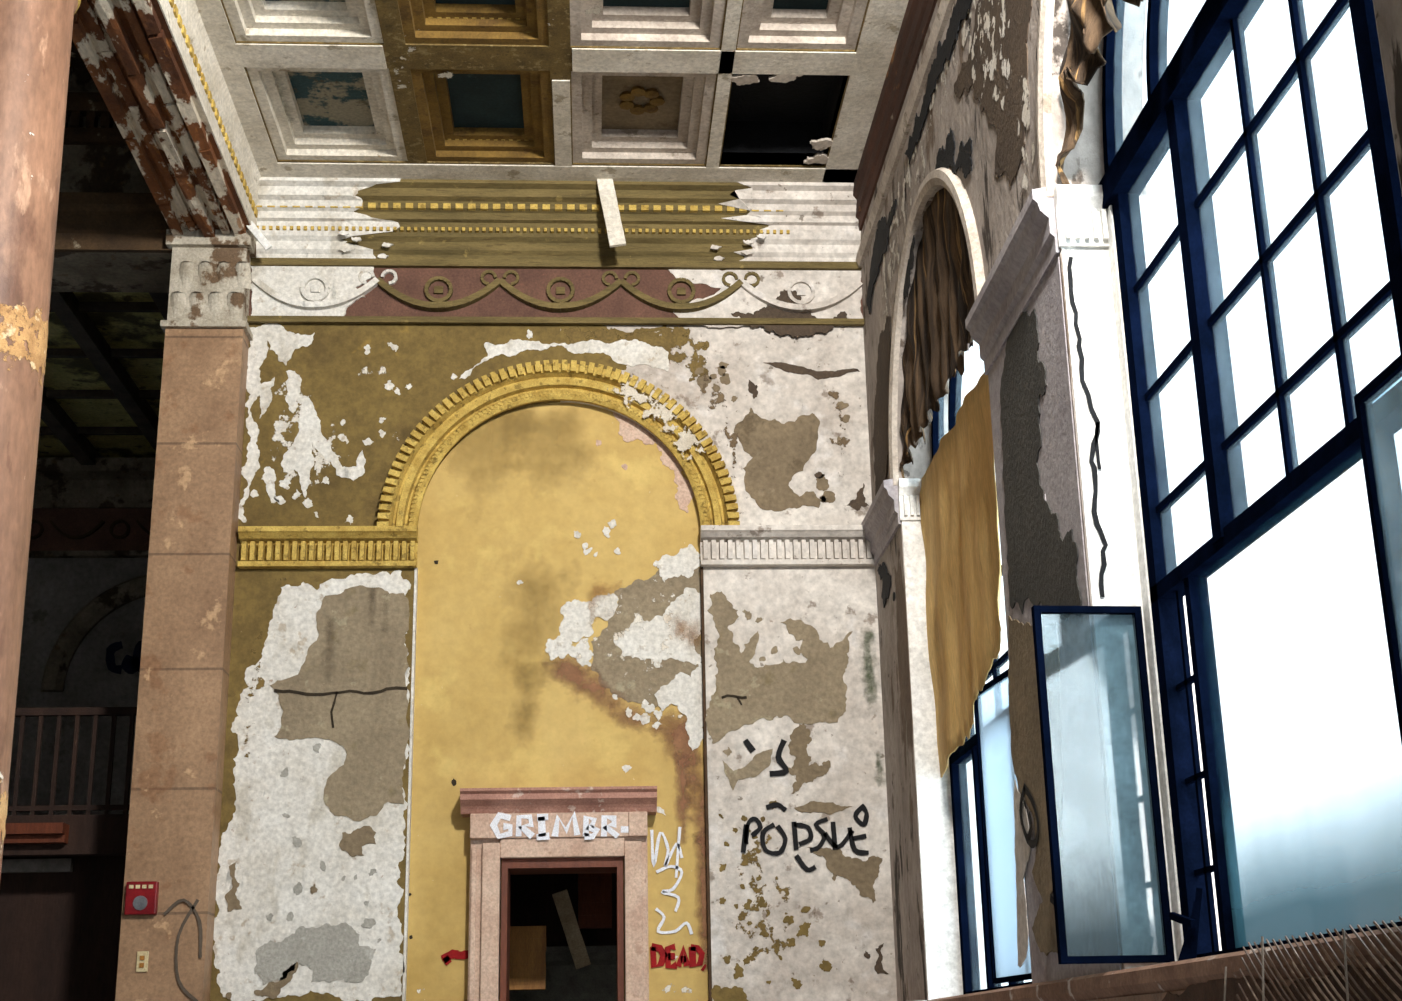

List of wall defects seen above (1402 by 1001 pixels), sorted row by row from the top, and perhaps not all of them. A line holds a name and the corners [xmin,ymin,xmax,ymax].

peeling [195,0,1040,523]
peeling [574,519,621,557]
spalling [877,562,895,608]
spalling [1000,309,1083,967]
crack [274,686,407,728]
peeling [0,772,9,858]
peeling [213,570,421,1001]
spalling [545,544,853,1001]
spalling [808,844,882,903]
spalling [864,943,888,974]